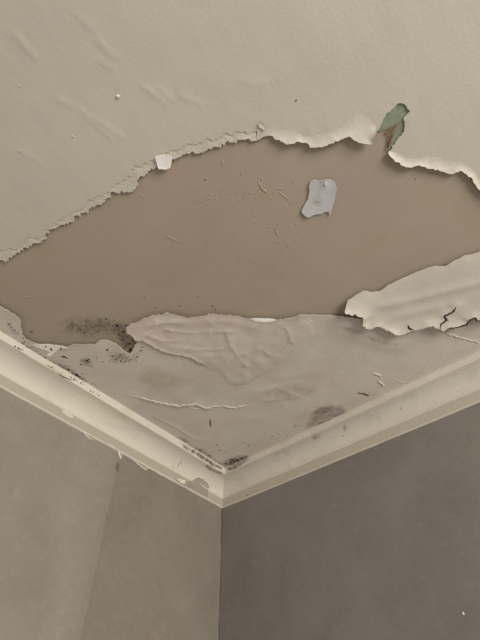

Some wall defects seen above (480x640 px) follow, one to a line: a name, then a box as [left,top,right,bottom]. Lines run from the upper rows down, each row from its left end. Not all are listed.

peeling [0,115,480,357]
water stain [80,315,143,367]
crack [440,308,480,344]